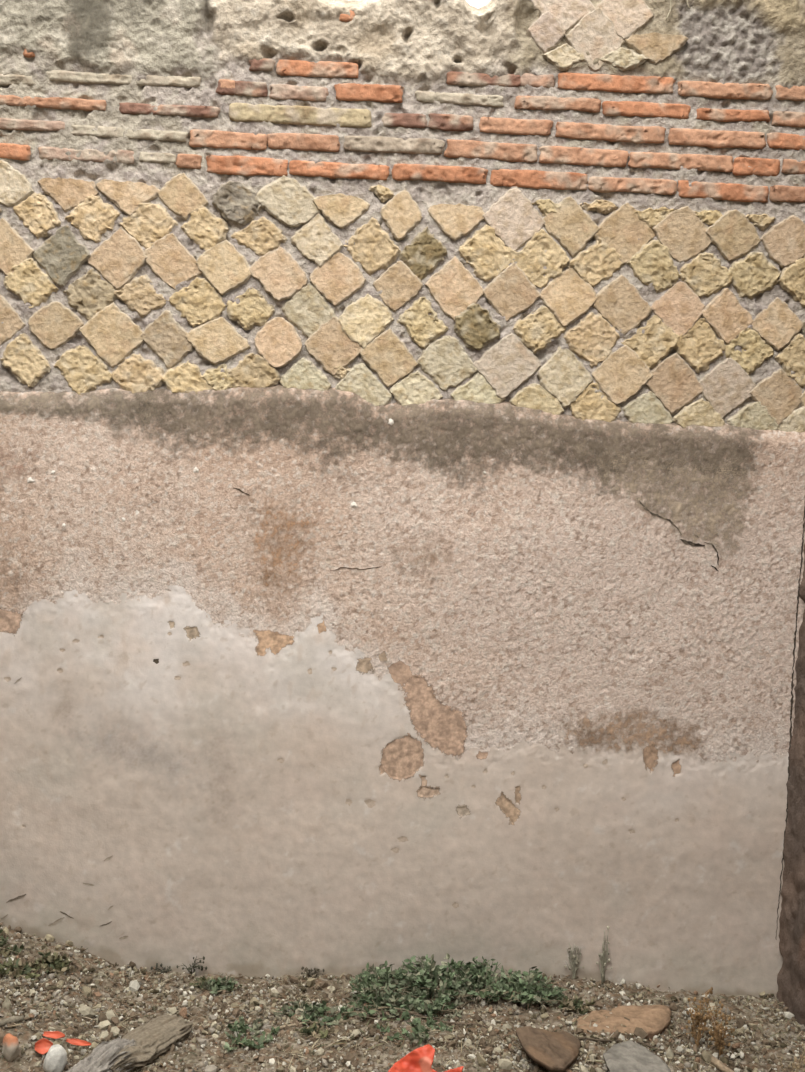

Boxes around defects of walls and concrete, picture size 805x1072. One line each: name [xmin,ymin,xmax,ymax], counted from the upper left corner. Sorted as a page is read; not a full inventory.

leakage [0,386,760,553]
crack [640,501,719,571]
peeling [0,608,23,634]
spalling [167,621,200,640]
peeling [253,630,294,656]
peeling [356,651,488,799]
spalling [643,744,658,772]
spalling [495,771,521,825]